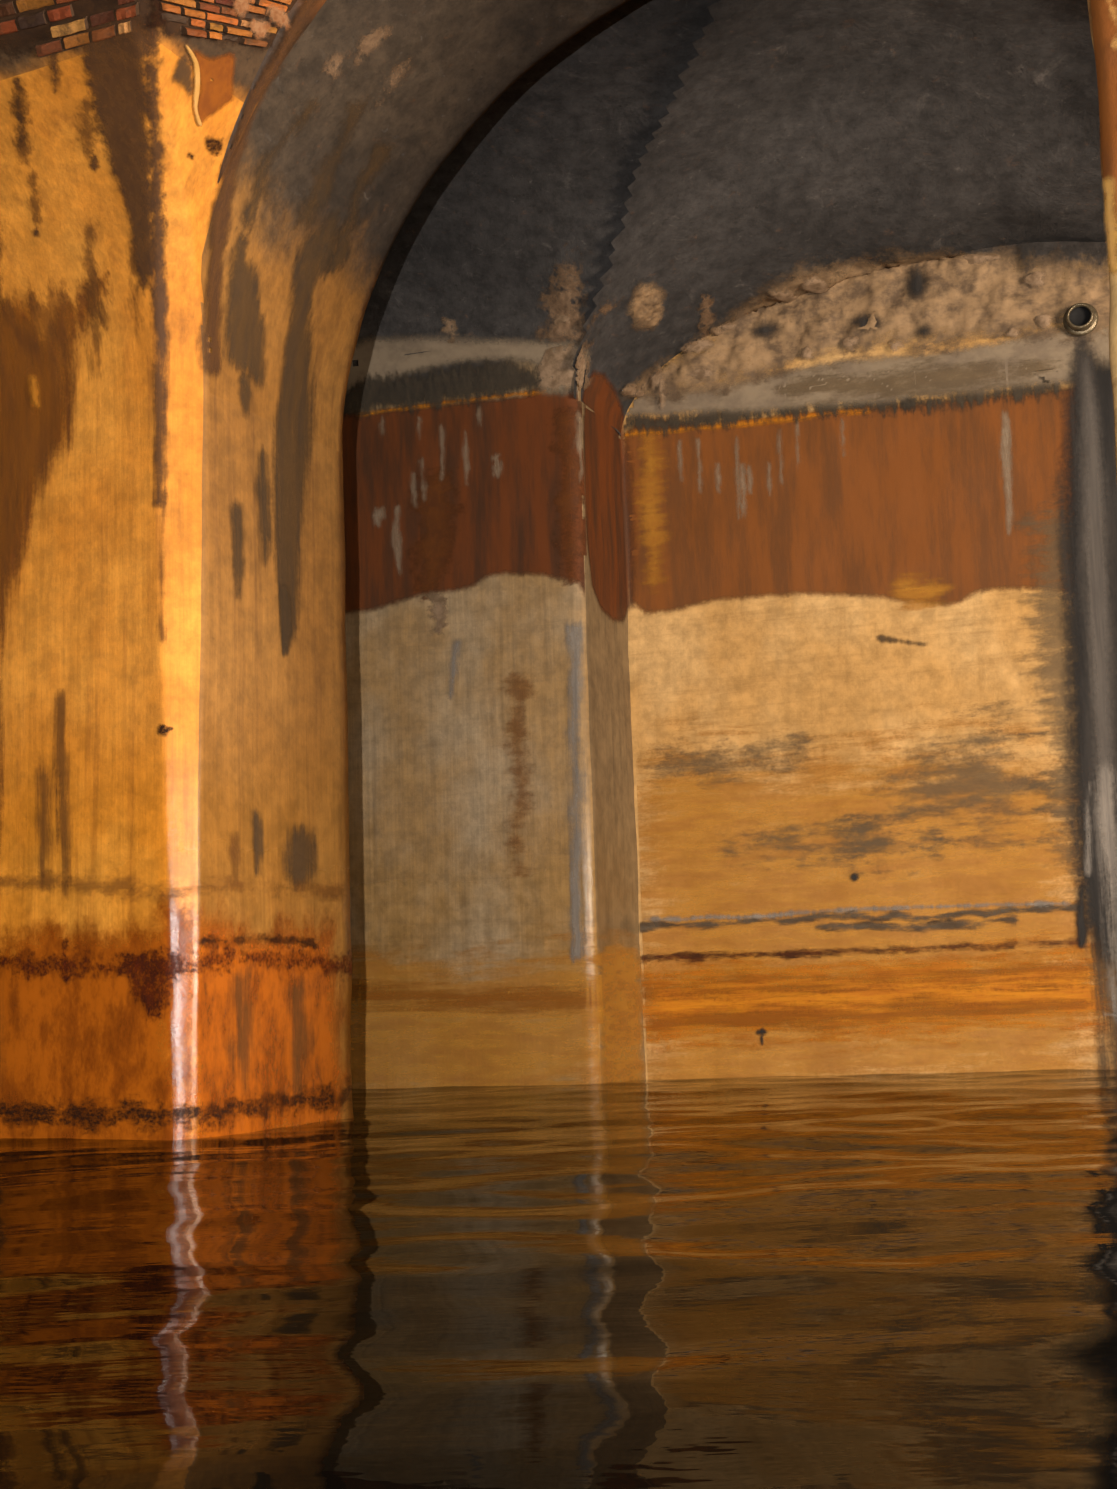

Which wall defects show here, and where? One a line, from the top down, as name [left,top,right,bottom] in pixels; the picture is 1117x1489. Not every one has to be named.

water stain [12,78,39,236]
water stain [0,226,109,646]
water stain [80,14,169,506]
flaking render [0,0,297,159]
crack [147,0,166,27]
water stain [202,0,317,412]
water stain [231,102,391,655]
corrosion [342,372,1073,621]
corrosion [1089,0,1117,273]
water stain [37,691,70,889]
water stain [624,326,1117,1080]
corrosion [0,899,1110,1140]